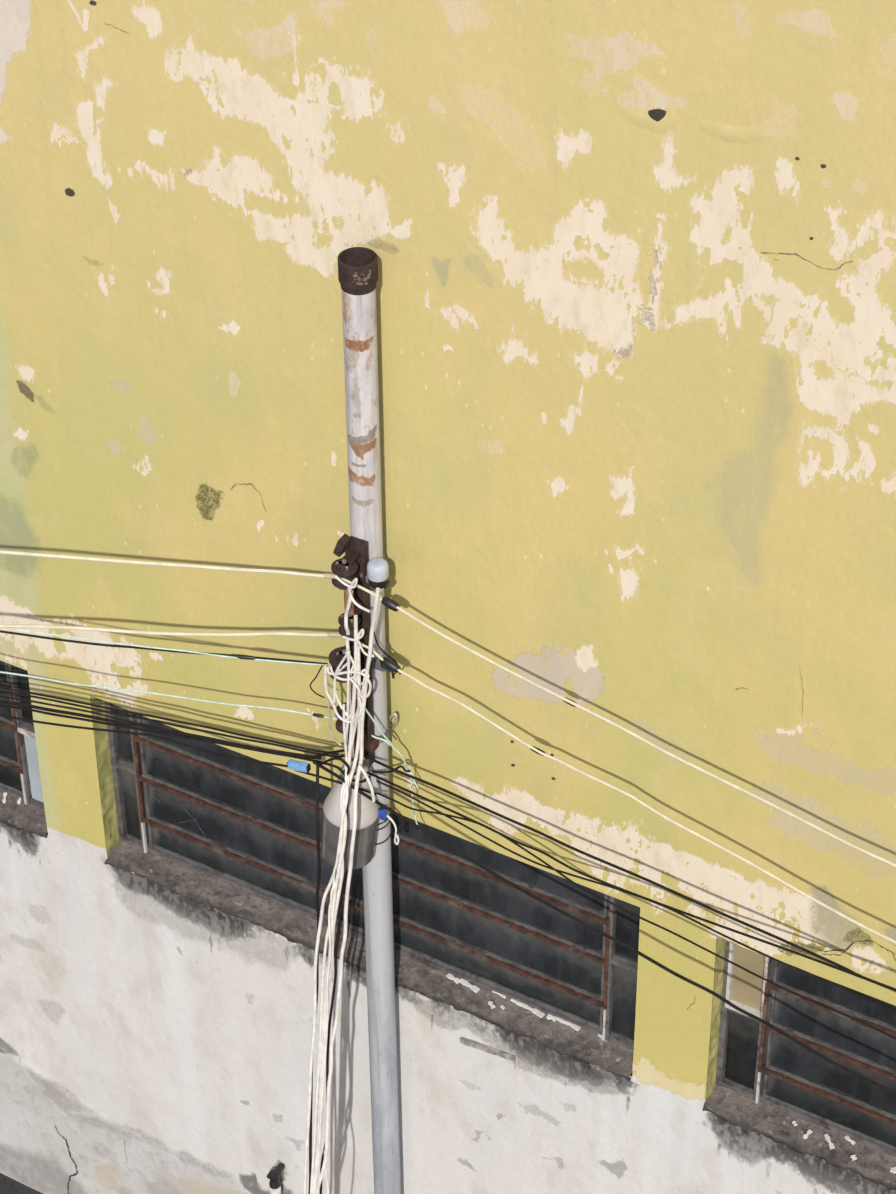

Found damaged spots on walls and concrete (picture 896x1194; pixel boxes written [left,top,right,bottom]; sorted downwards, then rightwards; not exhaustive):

peeling [0,0,33,105]
peeling [50,0,412,278]
peeling [468,109,896,500]
peeling [0,594,163,712]
peeling [490,644,607,708]
leakage [111,866,264,946]
peeling [438,776,890,974]
leakage [295,943,367,990]
leakage [395,986,639,1108]
crack [55,1127,78,1194]
leakage [147,1161,292,1194]
leakage [707,1112,896,1194]